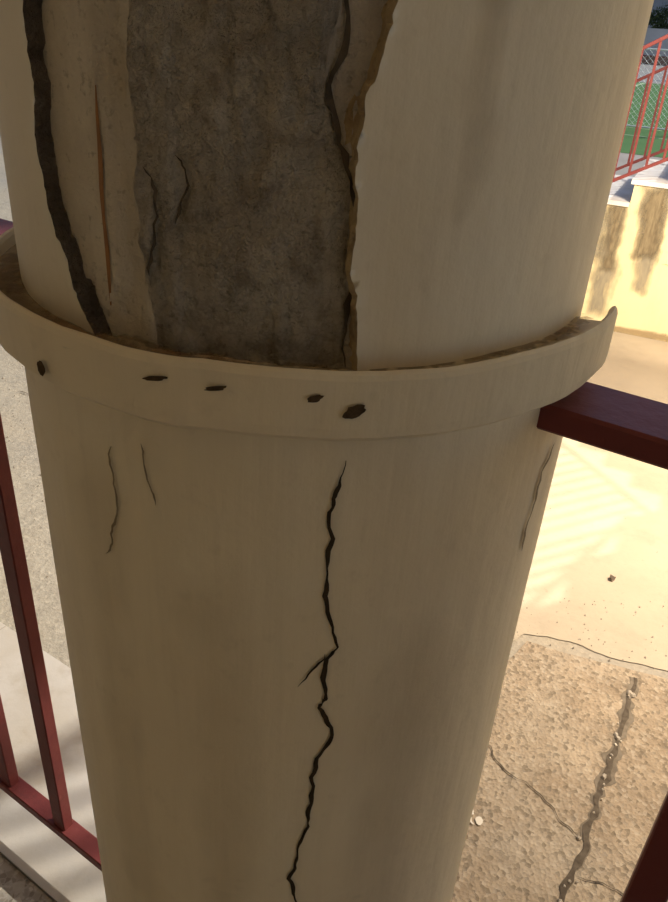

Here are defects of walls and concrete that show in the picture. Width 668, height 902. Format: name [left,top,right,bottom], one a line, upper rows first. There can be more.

spalling [23,0,398,371]
leakage [590,206,625,313]
leakage [633,188,668,291]
crack [287,462,346,902]
crack [559,676,639,902]